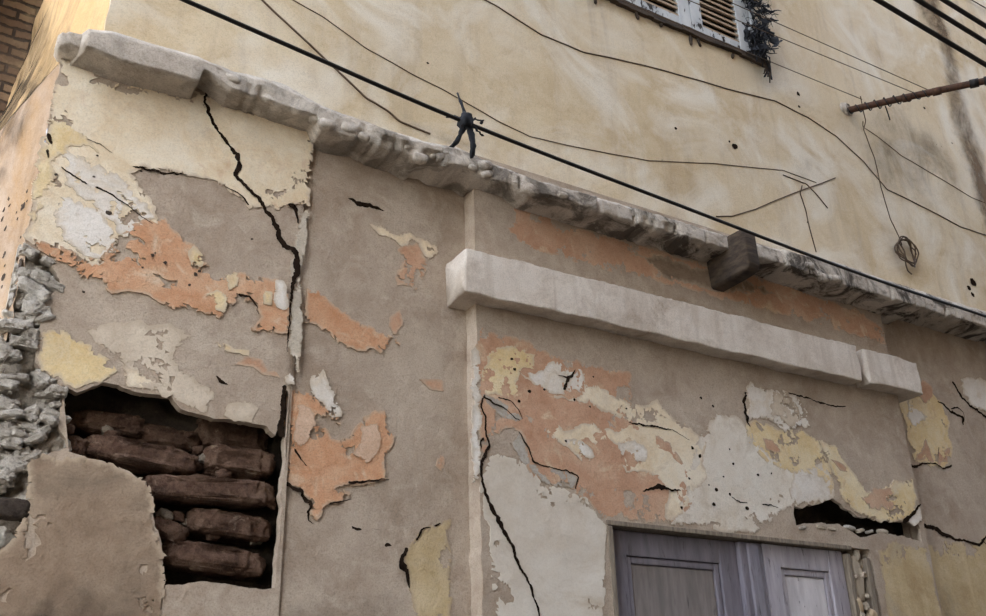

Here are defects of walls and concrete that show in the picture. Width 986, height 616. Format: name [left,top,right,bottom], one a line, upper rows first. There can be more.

peeling [0,59,404,590]
crack [203,93,301,346]
flaking render [369,224,438,290]
crack [480,394,579,616]
flaking render [469,328,922,533]
peeling [899,380,953,468]
peeling [961,377,986,411]